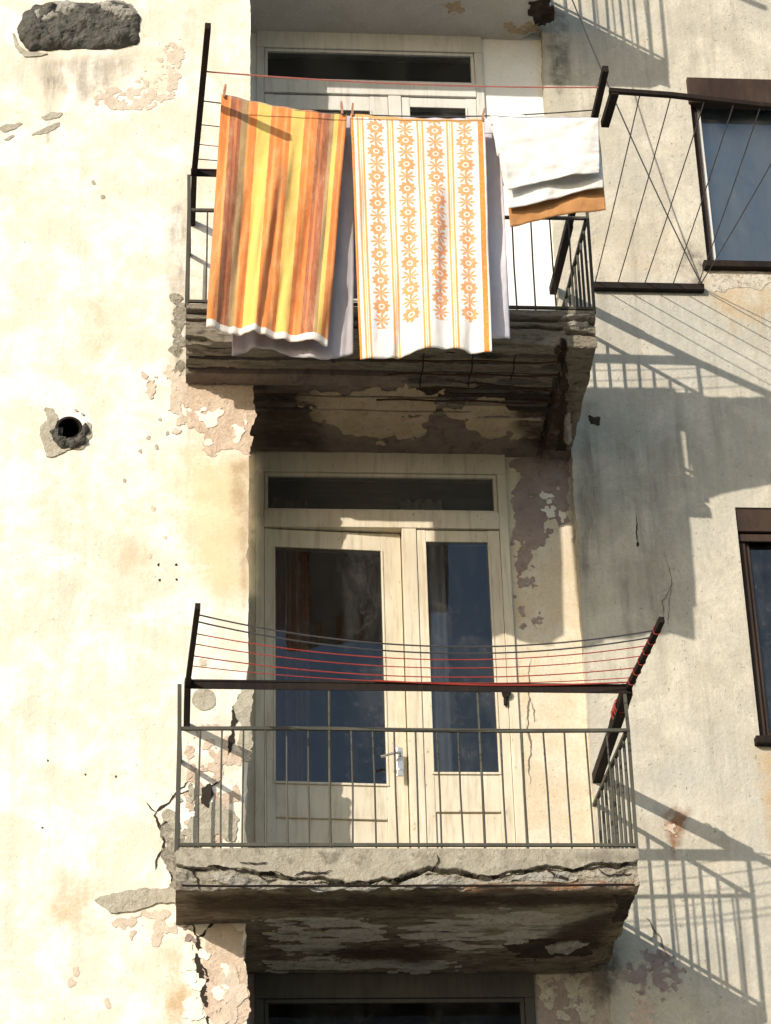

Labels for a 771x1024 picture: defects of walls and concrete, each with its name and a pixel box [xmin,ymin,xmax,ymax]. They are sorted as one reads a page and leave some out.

peeling [94,38,186,110]
peeling [138,293,257,457]
peeling [295,338,576,630]
crack [147,776,632,888]
spalling [160,689,635,923]
rust [668,812,686,847]
crack [192,924,213,1024]
peeling [110,903,601,1024]
peeling [623,944,687,1002]